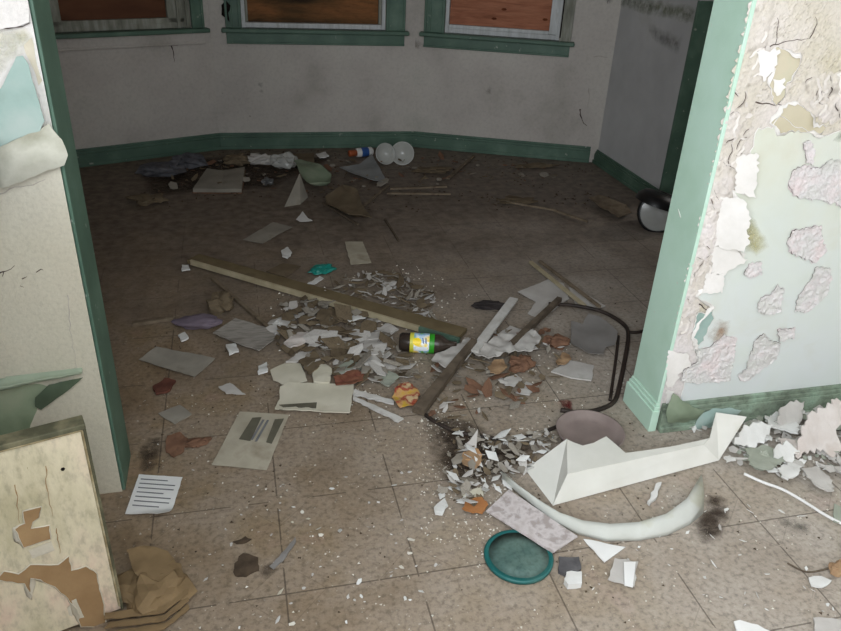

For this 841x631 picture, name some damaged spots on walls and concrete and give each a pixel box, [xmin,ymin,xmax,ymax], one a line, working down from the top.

peeling [0,337,83,435]
peeling [665,0,841,433]